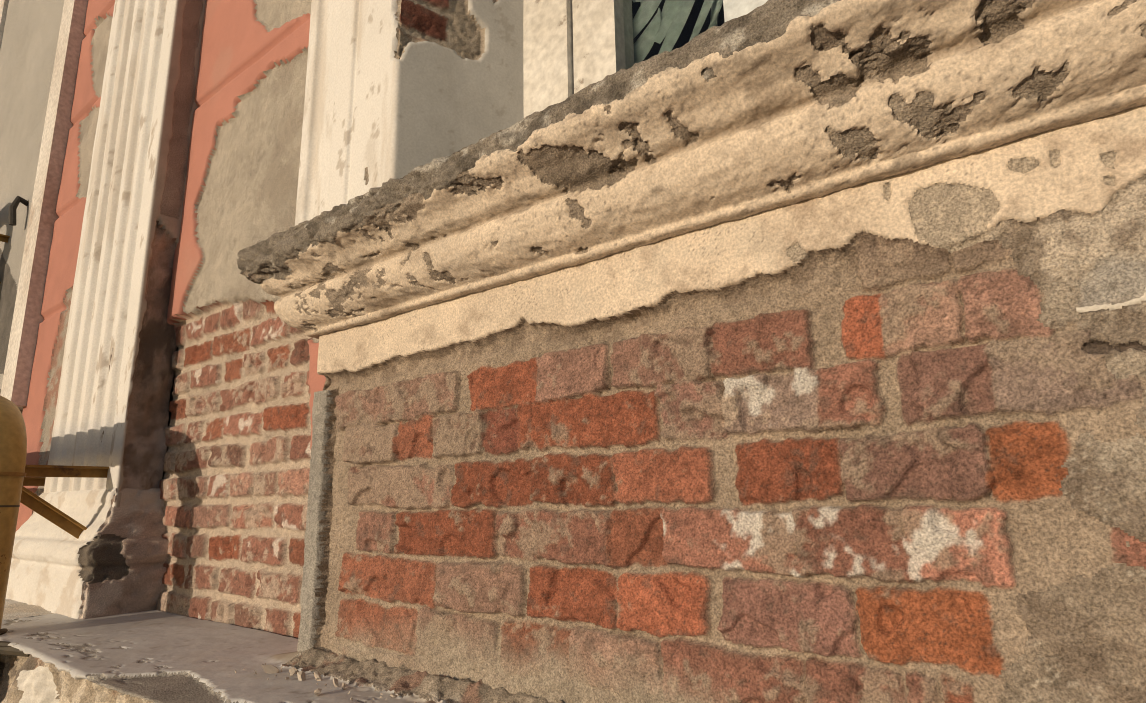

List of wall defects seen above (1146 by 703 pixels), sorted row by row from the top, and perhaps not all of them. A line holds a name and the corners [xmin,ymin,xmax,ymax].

flaking render [394,0,486,60]
peeling [973,0,1035,48]
peeling [795,24,987,141]
peeling [1012,62,1070,102]
peeling [517,122,657,229]
peeling [663,110,699,146]
peeling [824,126,880,161]
peeling [1007,149,1061,174]
flaking render [76,0,456,639]
crack [1081,341,1146,354]
flaking render [313,182,1146,703]
flaking render [4,619,247,703]